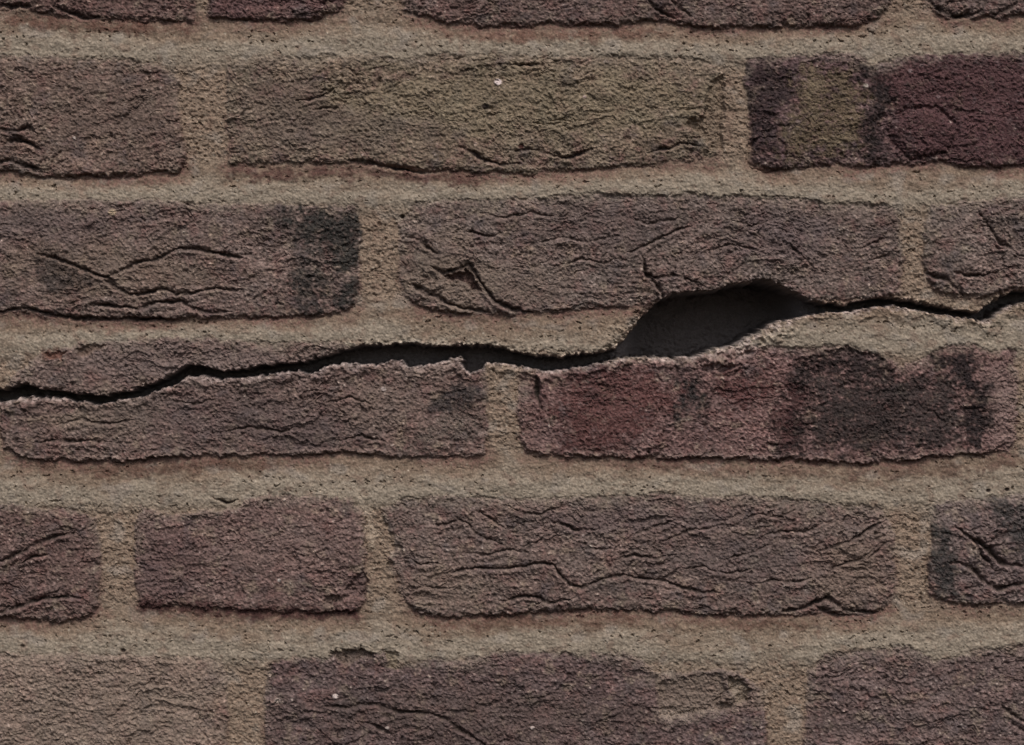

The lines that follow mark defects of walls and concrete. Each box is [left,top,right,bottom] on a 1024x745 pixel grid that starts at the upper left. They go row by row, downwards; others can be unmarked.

crack [0,211,1024,444]